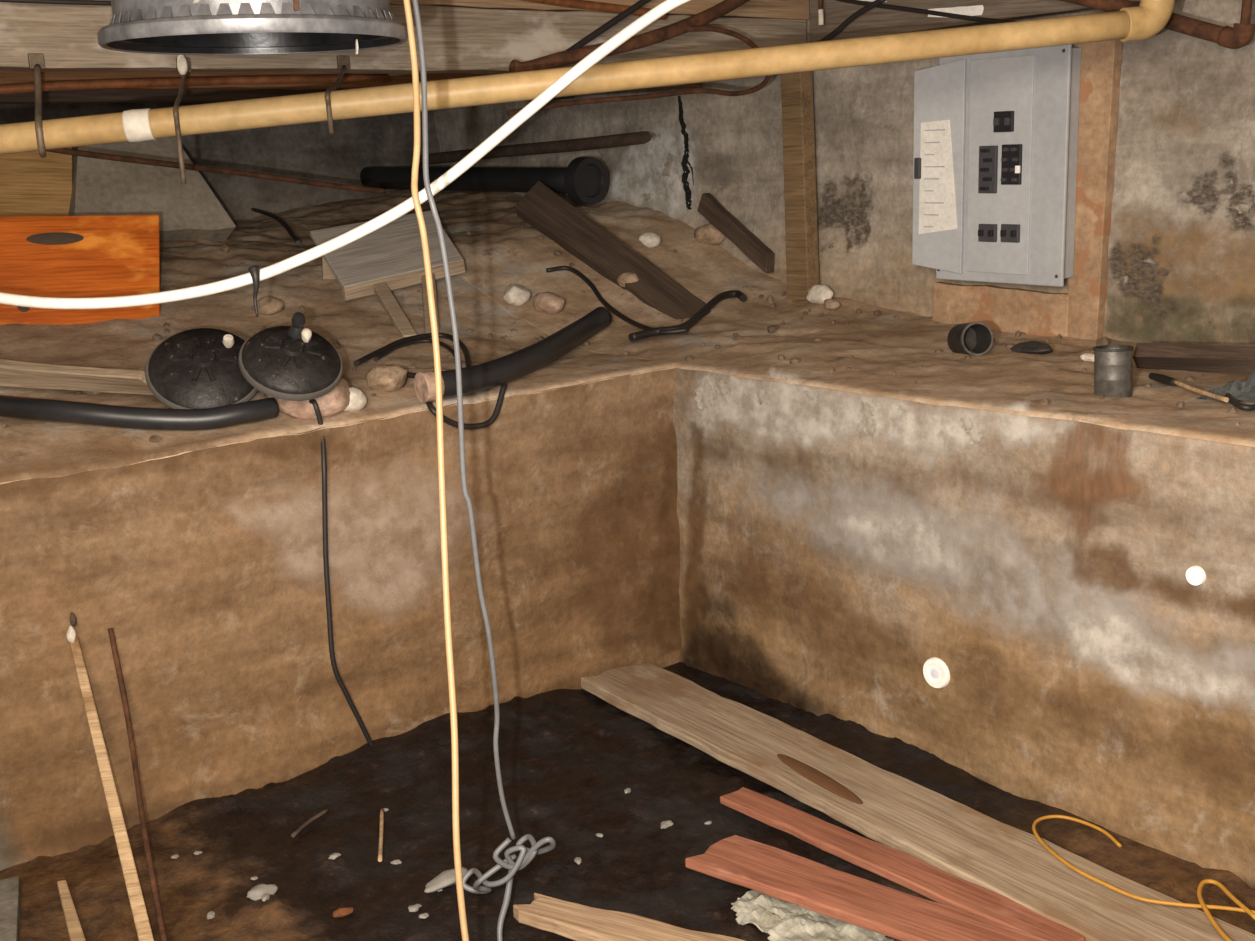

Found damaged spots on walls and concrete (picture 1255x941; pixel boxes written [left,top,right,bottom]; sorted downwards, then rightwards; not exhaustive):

crack [678,95,694,210]
water stain [775,486,1255,702]